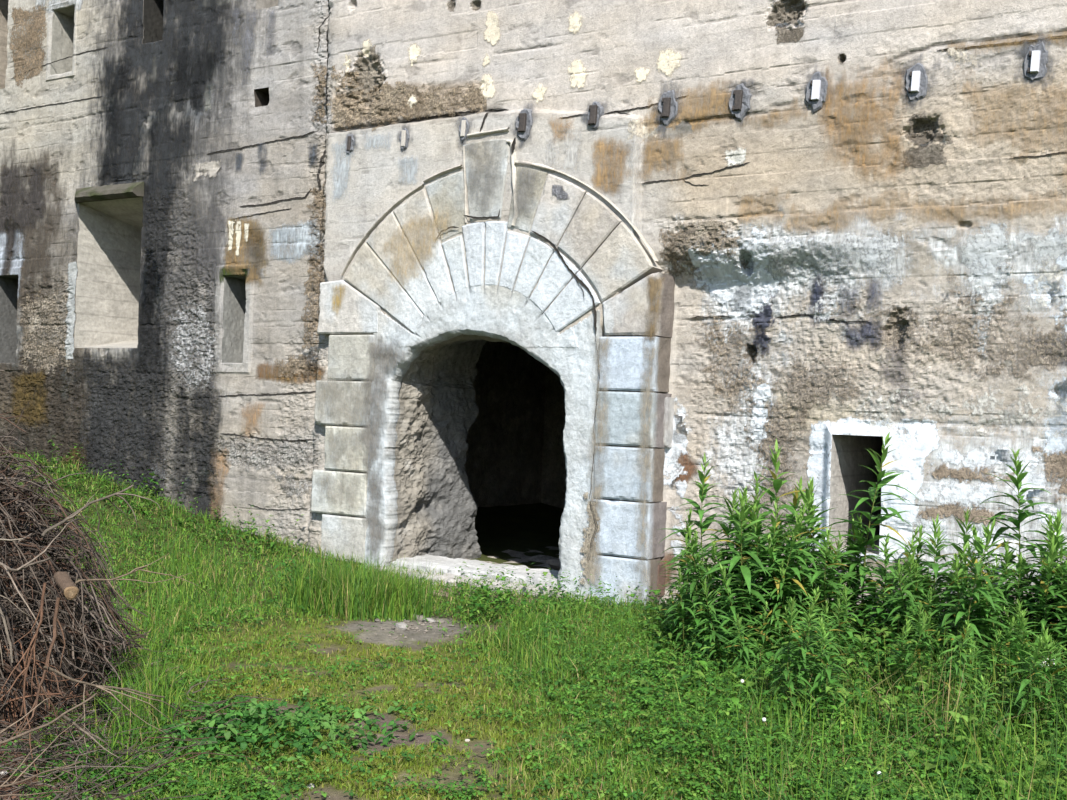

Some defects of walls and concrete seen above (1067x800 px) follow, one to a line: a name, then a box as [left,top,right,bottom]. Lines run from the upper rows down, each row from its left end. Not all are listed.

spalling [766,0,806,44]
crack [207,0,508,255]
spalling [310,45,487,131]
rust [644,87,731,173]
crack [643,162,750,186]
rust [825,83,900,174]
spalling [903,113,953,168]
damp [0,0,256,522]
spalling [275,180,326,379]
peeling [659,219,1067,563]